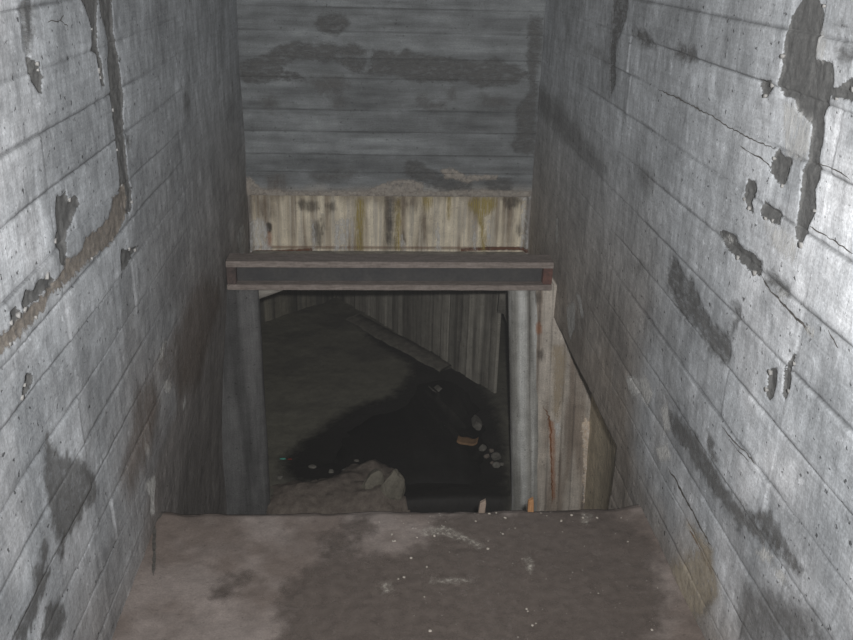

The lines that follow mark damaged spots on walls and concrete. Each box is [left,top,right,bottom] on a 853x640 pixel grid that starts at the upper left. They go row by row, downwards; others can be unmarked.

crack [658,89,780,169]
spalling [760,0,853,248]
spalling [0,0,133,354]
spalling [742,179,783,225]
spalling [120,245,138,270]
spalling [720,230,788,292]
crack [761,275,838,348]
spalling [764,353,796,400]
damp [46,434,96,558]
damp [662,404,797,569]